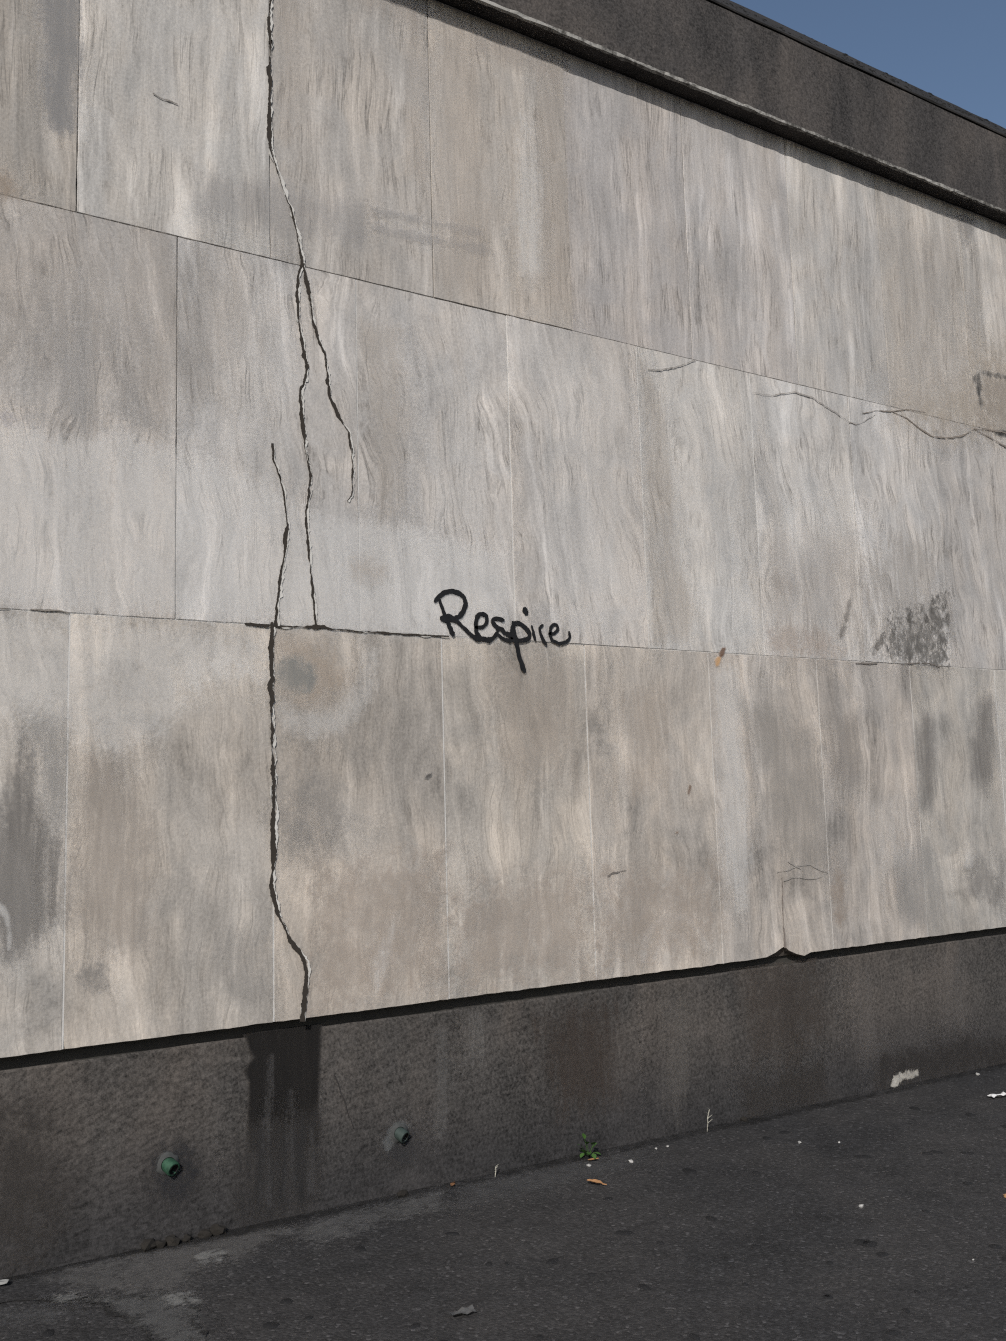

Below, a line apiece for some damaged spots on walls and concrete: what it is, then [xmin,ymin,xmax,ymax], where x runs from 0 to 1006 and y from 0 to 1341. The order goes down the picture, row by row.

crack [245,0,449,1022]
crack [759,391,1006,448]
water stain [235,1024,321,1225]